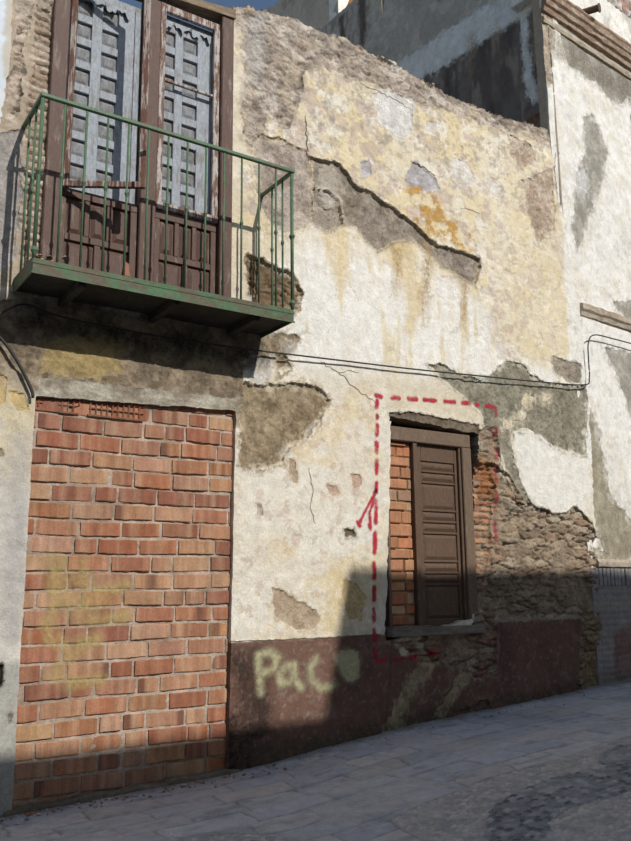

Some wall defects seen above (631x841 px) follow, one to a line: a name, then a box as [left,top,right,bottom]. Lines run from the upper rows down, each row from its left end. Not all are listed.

damp [358,0,366,47]
flaking render [5,0,54,266]
flaking render [233,5,557,242]
flaking render [571,114,609,249]
flaking render [245,254,304,311]
flaking render [288,459,298,483]
flaking render [472,462,497,594]
peeling [389,347,631,560]
flaking render [271,588,321,631]